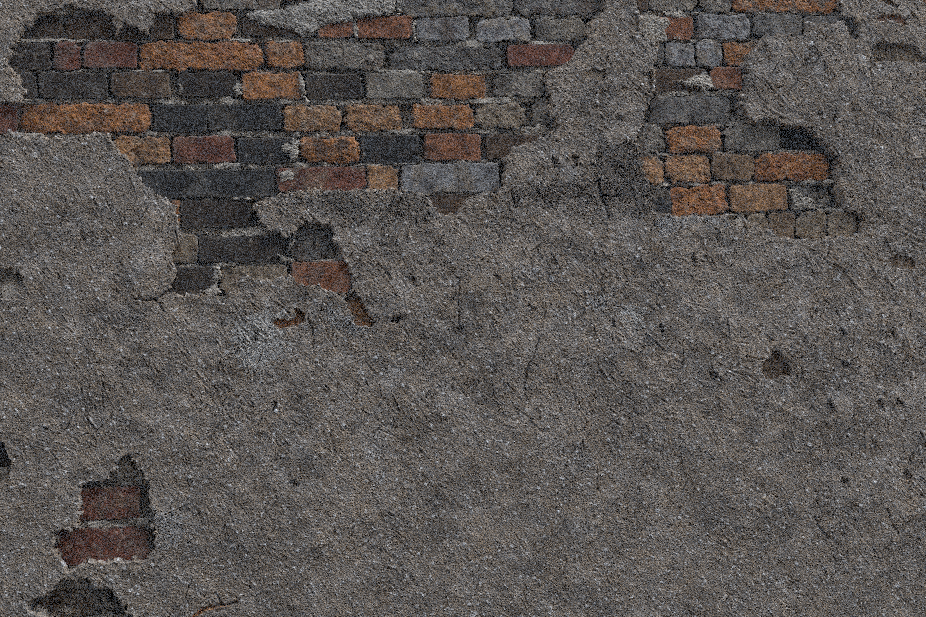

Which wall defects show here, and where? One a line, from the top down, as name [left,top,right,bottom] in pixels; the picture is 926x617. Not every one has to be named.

spalling [0,0,607,329]
spalling [632,0,868,241]
spalling [761,334,793,381]
spalling [25,454,157,617]